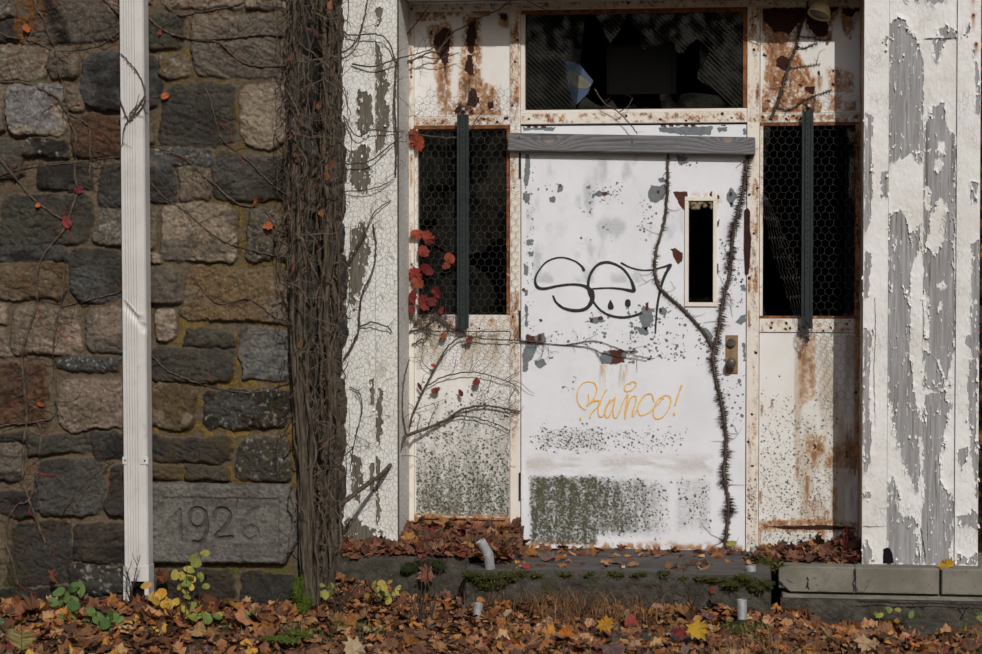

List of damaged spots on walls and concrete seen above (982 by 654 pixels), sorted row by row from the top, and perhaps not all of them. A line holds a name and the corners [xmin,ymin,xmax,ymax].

peeling [347,42,390,196]
rust [410,3,605,125]
peeling [347,217,372,312]
peeling [522,154,726,372]
peeling [727,187,737,207]
peeling [719,239,746,325]
rust [618,0,861,543]
peeling [861,17,980,566]
peeling [343,378,383,540]